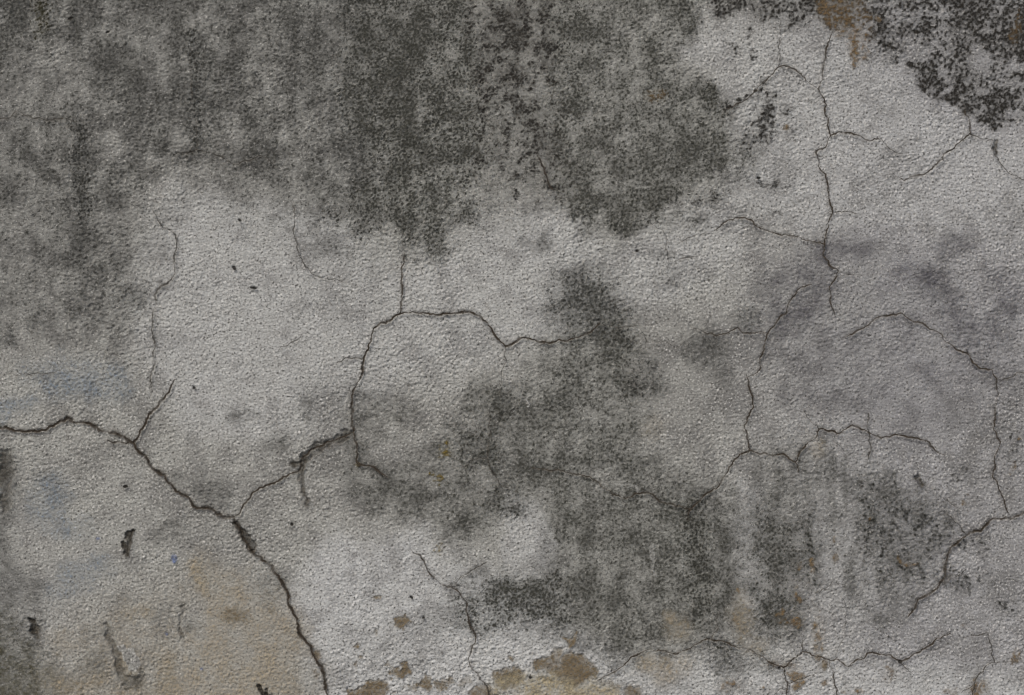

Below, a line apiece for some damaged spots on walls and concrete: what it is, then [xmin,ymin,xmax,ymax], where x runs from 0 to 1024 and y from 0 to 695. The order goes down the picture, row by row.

crack [0,111,70,121]
crack [172,126,274,167]
damp [0,0,1024,344]
crack [289,196,341,281]
crack [532,24,1024,617]
crack [0,211,678,695]
damp [344,268,989,675]
peeling [346,661,451,695]
peeling [470,632,640,695]
crack [597,611,1014,695]